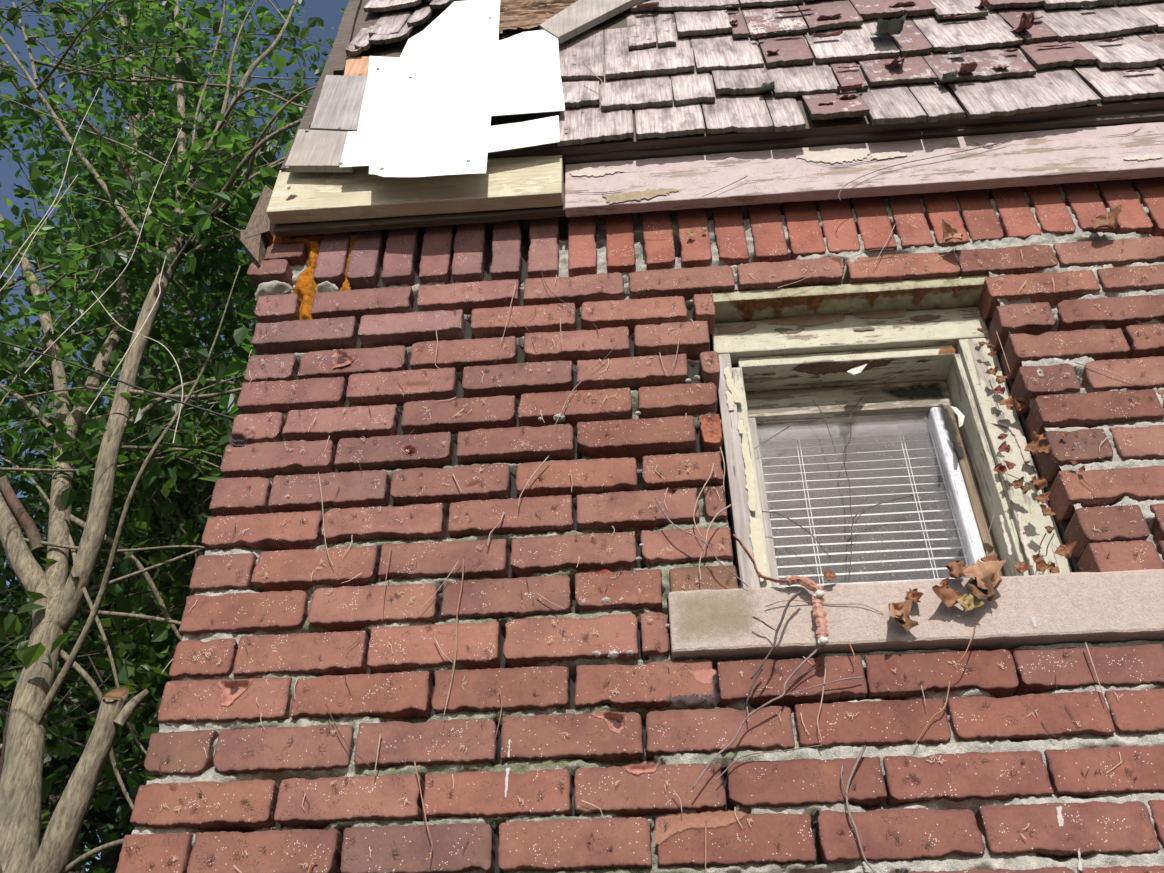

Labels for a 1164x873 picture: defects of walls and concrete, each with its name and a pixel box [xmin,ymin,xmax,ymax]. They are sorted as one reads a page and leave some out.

peeling [794,147,913,164]
corrosion [732,285,977,322]
spalling [332,350,355,369]
peeling [762,359,904,386]
spalling [218,679,253,706]
spalling [592,711,627,733]
spalling [653,811,746,844]